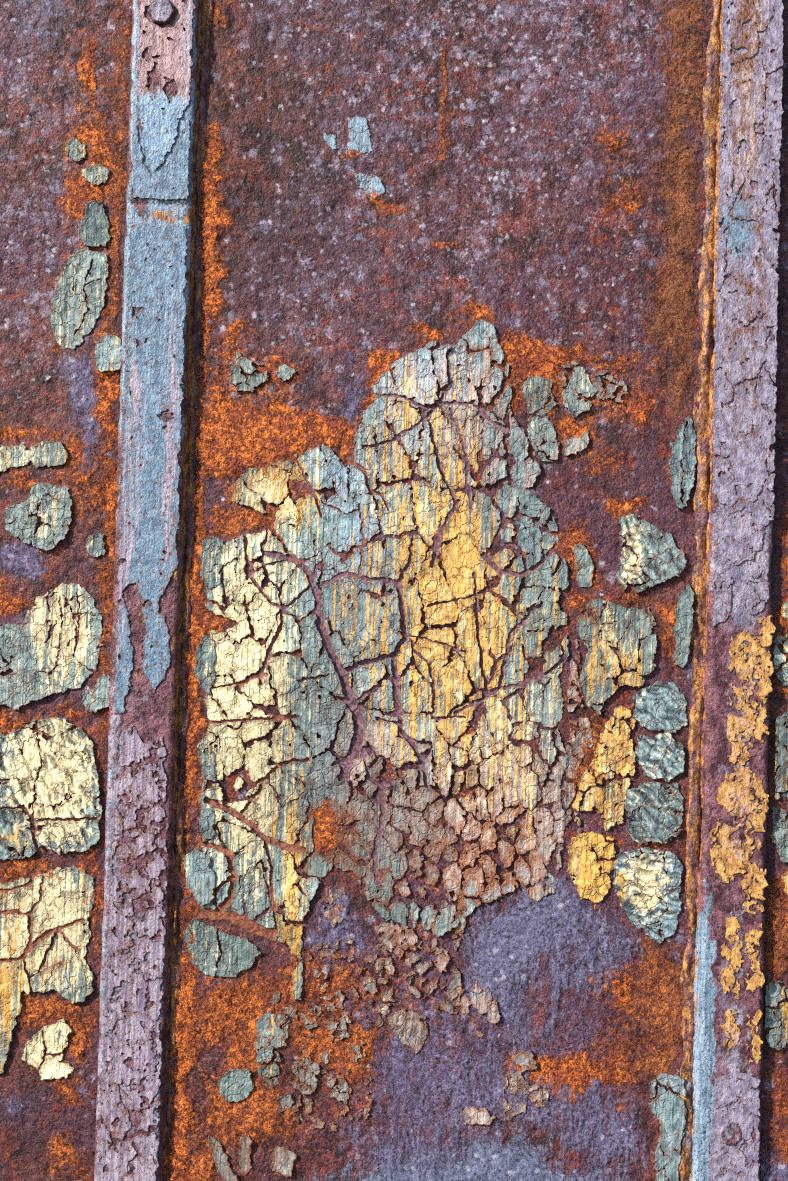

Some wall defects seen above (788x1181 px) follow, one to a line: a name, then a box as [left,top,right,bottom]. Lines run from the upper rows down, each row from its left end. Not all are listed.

peeling [131,0,196,200]
rust [500,0,709,477]
crack [0,718,97,996]
rust [0,370,120,678]
peeling [0,200,188,1181]
rust [164,862,381,1181]
rust [180,122,407,856]
crack [195,342,569,941]
peeling [183,319,697,1131]
rust [504,939,683,1121]
peeling [648,1073,687,1181]
peeling [709,0,788,1181]